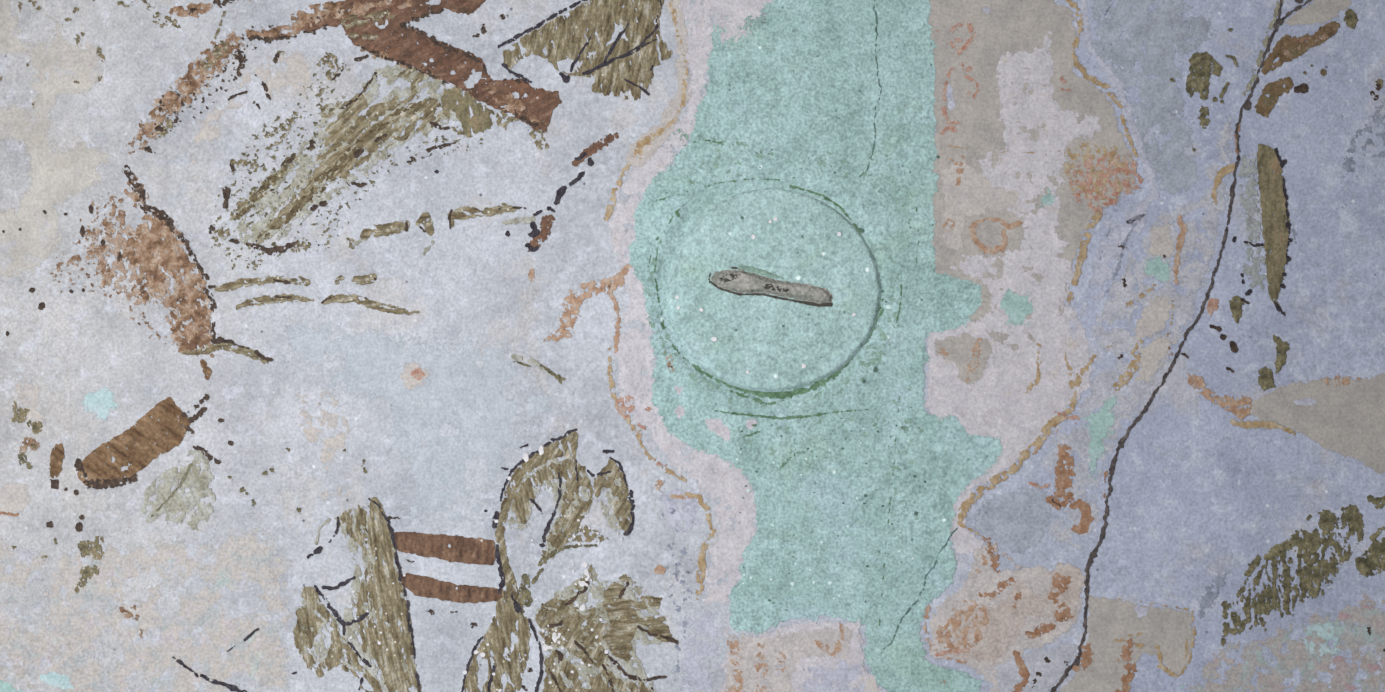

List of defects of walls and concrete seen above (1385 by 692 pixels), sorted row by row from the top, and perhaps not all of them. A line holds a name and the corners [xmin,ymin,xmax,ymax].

peeling [705,418,757,460]
flaking render [916,0,1216,352]
crack [1050,0,1311,692]